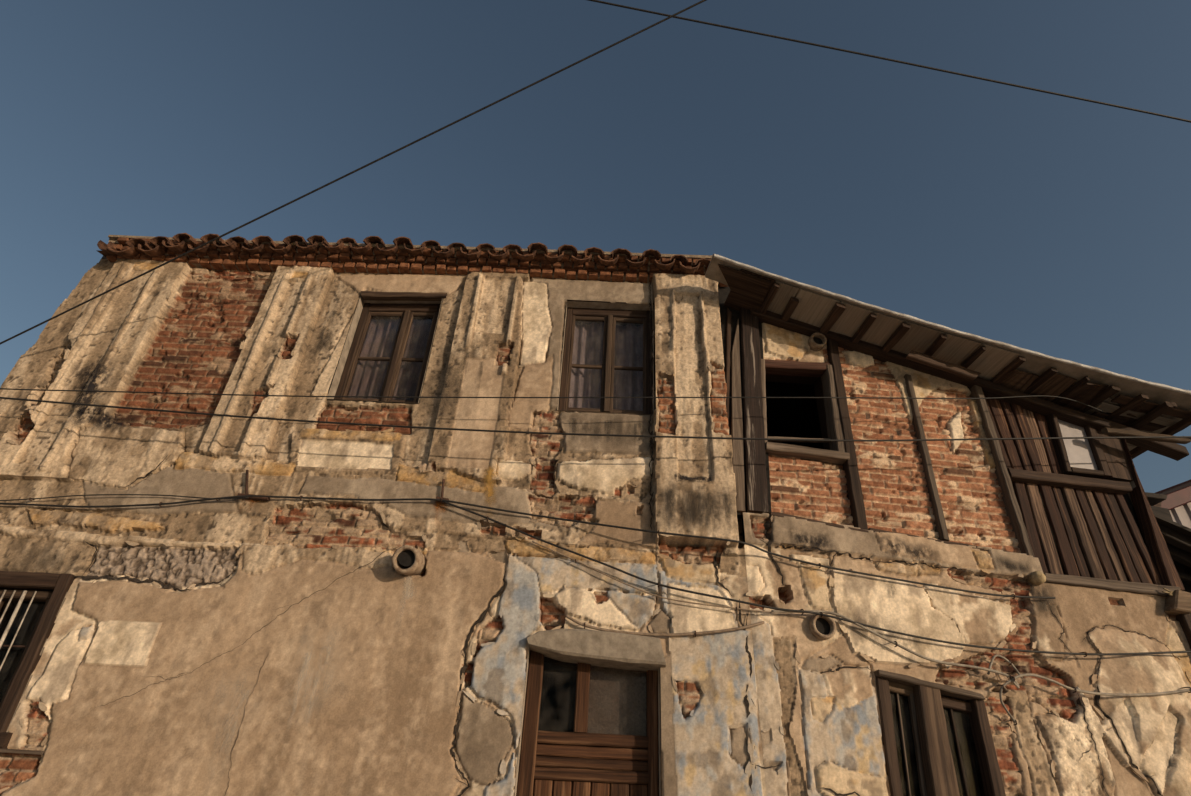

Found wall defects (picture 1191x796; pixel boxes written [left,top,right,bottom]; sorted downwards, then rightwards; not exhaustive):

leakage [77,362,124,428]
spalling [29,507,245,590]
peeling [68,268,1116,796]
leakage [666,491,728,525]
peeling [0,625,97,796]
crack [451,571,506,796]
crack [822,787,860,796]
crack [1050,608,1167,796]